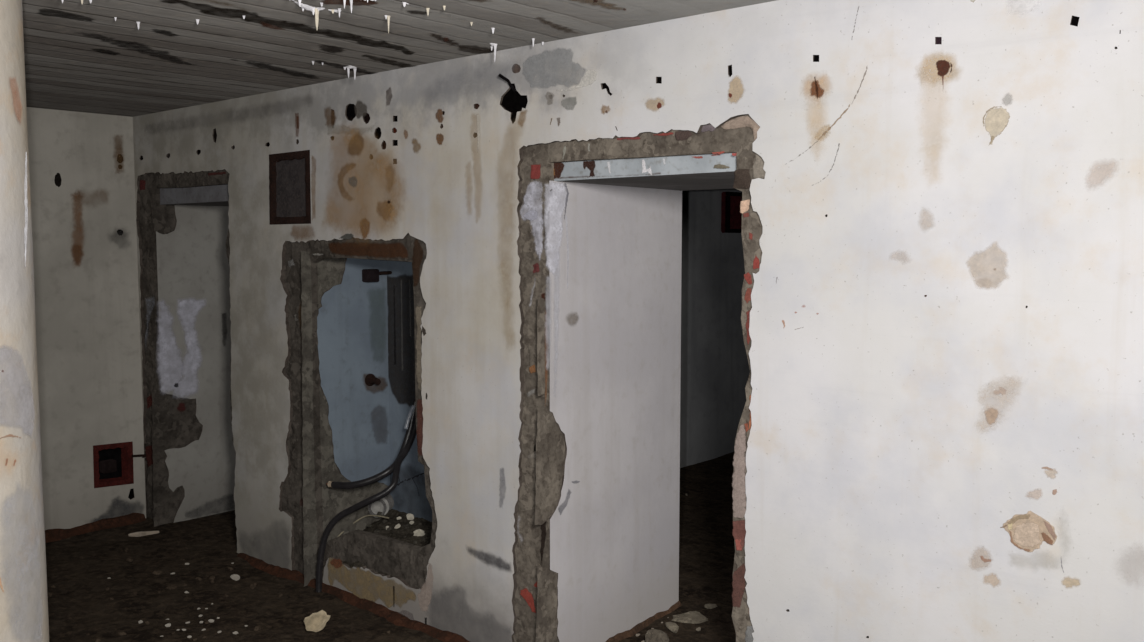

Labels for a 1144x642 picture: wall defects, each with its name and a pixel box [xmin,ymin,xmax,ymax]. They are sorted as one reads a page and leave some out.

water stain [292,0,376,30]
peeling [501,49,612,126]
rust [811,77,824,99]
crack [799,67,867,176]
rust [924,59,952,82]
spalling [128,170,230,527]
spalling [513,115,766,642]
spalling [281,233,437,620]
peeling [1000,467,1057,552]